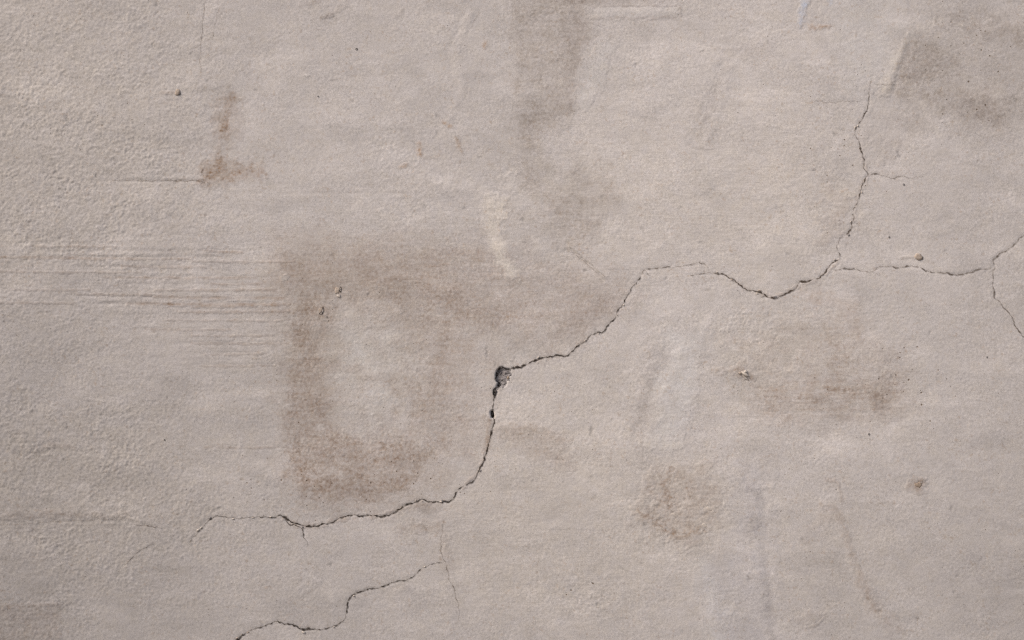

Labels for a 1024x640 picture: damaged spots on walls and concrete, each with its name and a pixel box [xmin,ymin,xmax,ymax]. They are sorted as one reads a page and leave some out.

damp [250,0,665,574]
crack [190,96,1024,542]
crack [236,546,457,640]